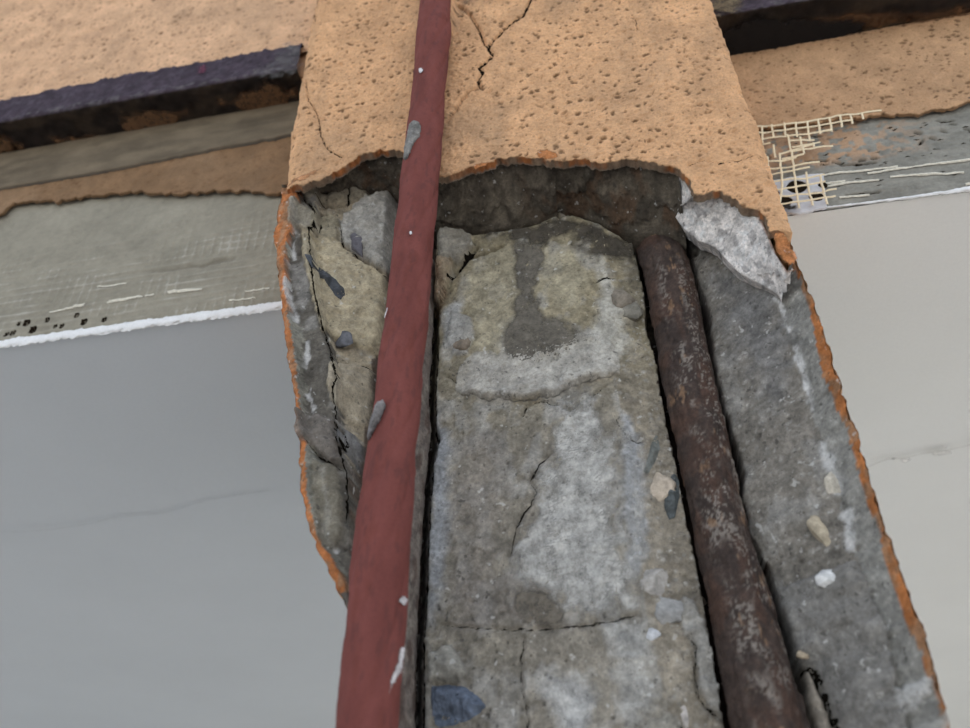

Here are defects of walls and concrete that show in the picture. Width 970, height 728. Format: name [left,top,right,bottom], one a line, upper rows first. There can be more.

crack [448,0,532,123]
flaking render [759,103,970,210]
flaking render [0,156,403,608]
crack [435,343,456,445]
spalling [415,149,949,728]
crack [510,457,549,556]
crack [423,473,434,728]
crack [451,615,636,728]
crack [796,667,840,728]